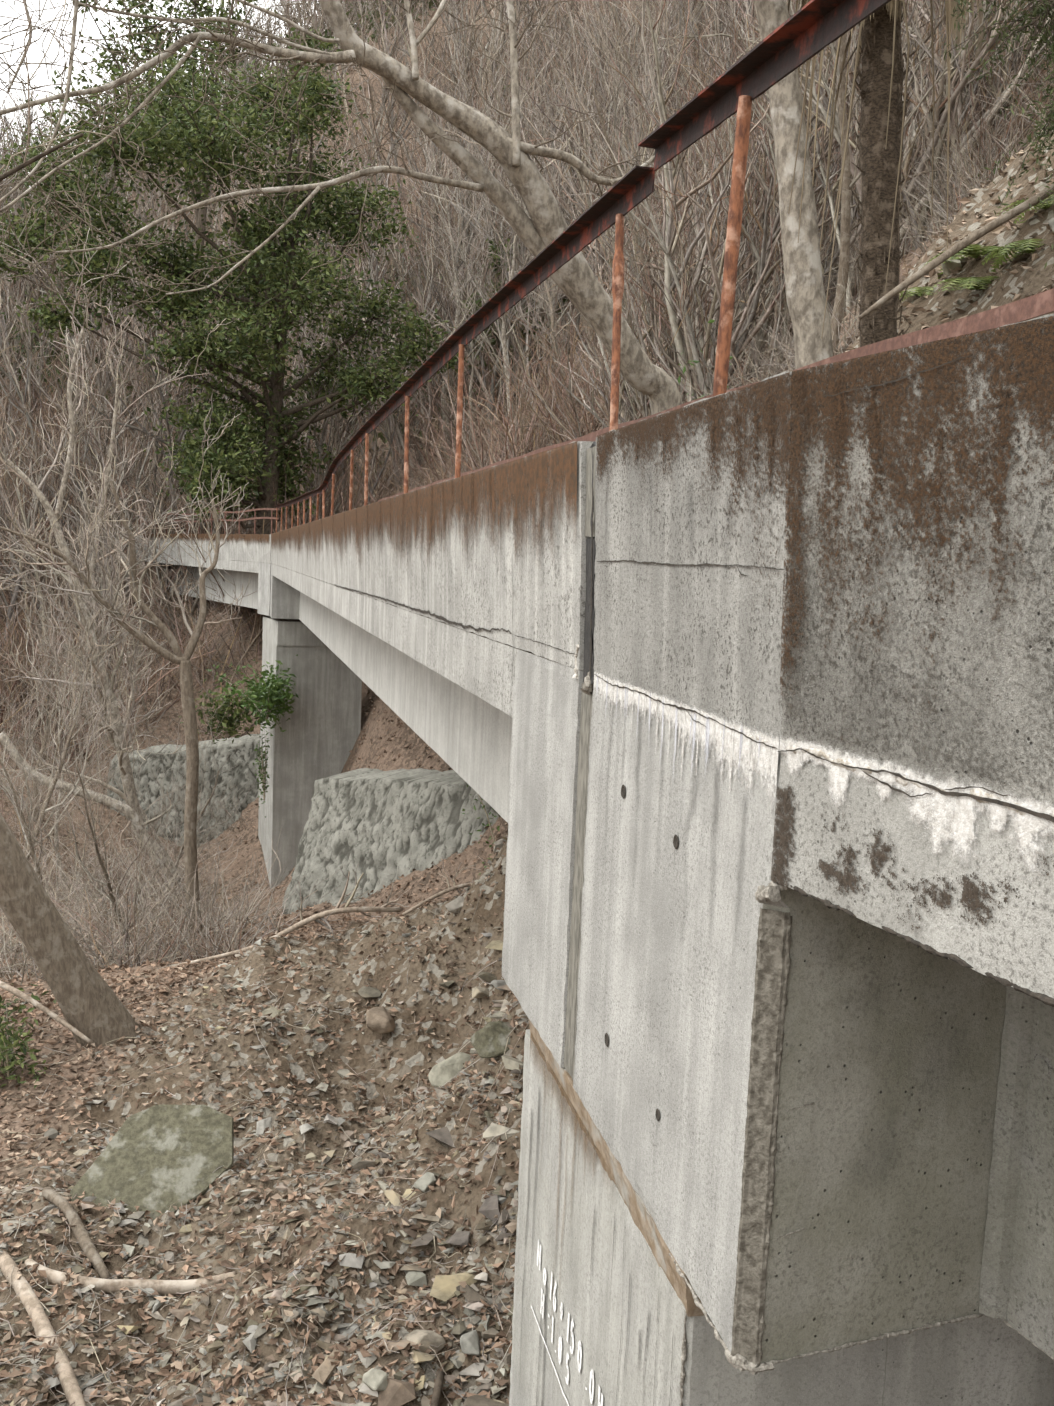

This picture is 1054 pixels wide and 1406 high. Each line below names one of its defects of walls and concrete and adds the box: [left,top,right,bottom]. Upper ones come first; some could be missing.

crack [597,560,785,576]
crack [335,577,1054,1073]
damp [593,373,1054,890]
crack [653,1296,674,1406]